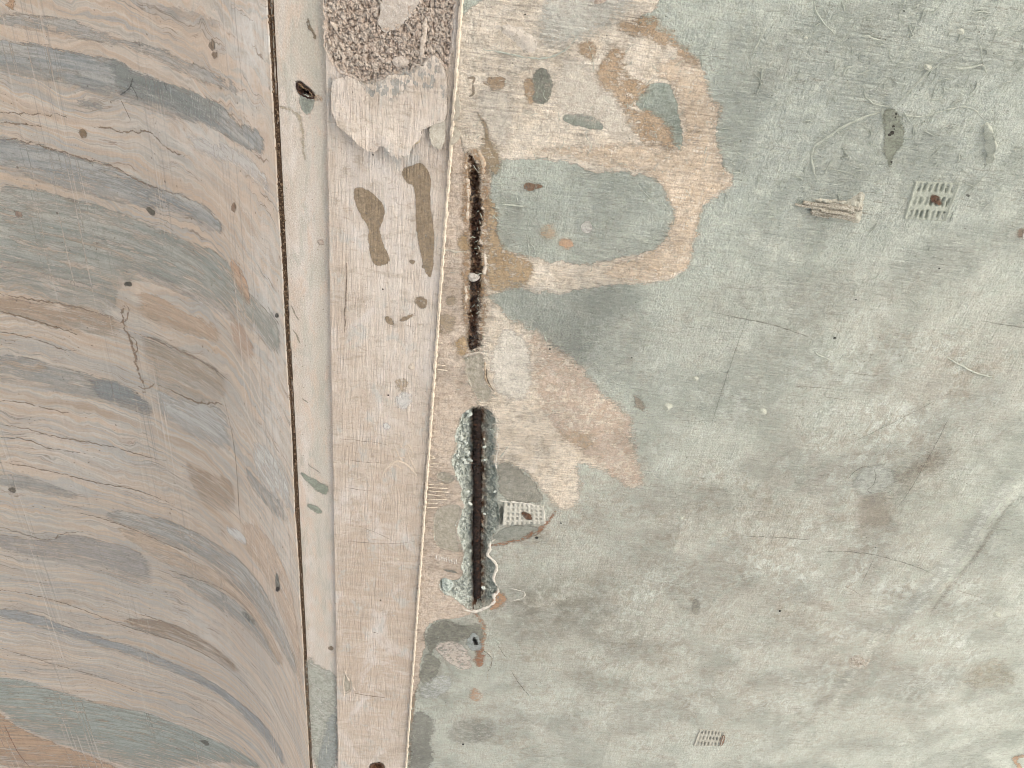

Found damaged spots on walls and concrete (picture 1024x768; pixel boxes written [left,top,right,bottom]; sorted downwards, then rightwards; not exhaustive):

peeling [296,2,461,158]
rust [455,149,490,356]
spalling [433,406,512,613]